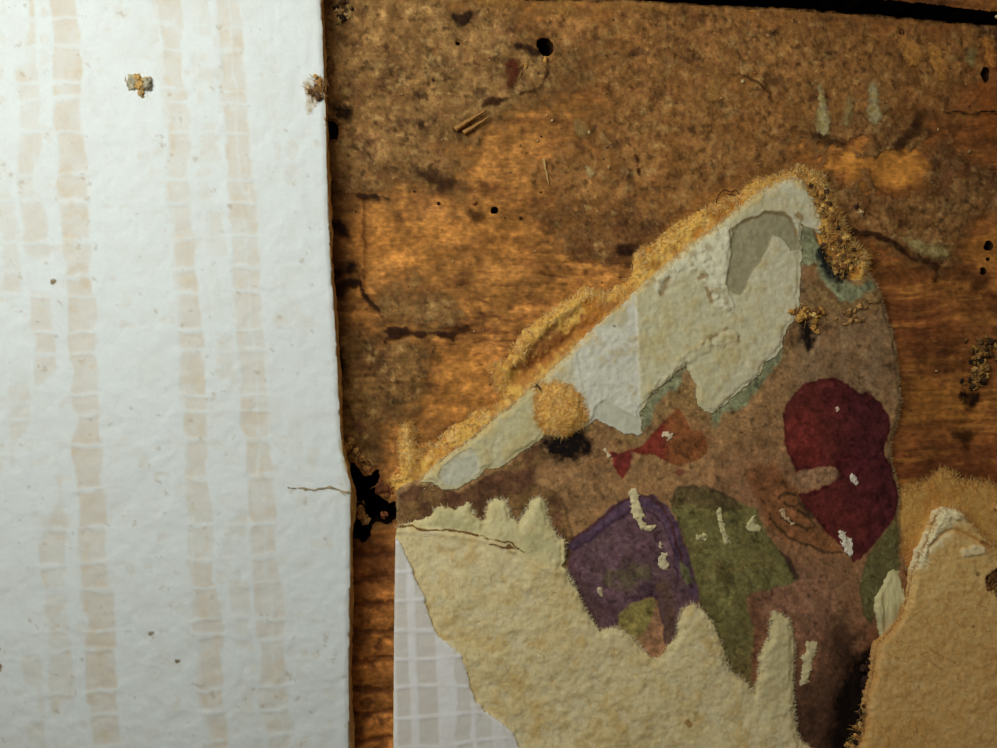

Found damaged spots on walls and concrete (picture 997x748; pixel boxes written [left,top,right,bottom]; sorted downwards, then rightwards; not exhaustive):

peeling [417,174,824,490]
leakage [959,390,980,410]
crack [288,486,351,495]